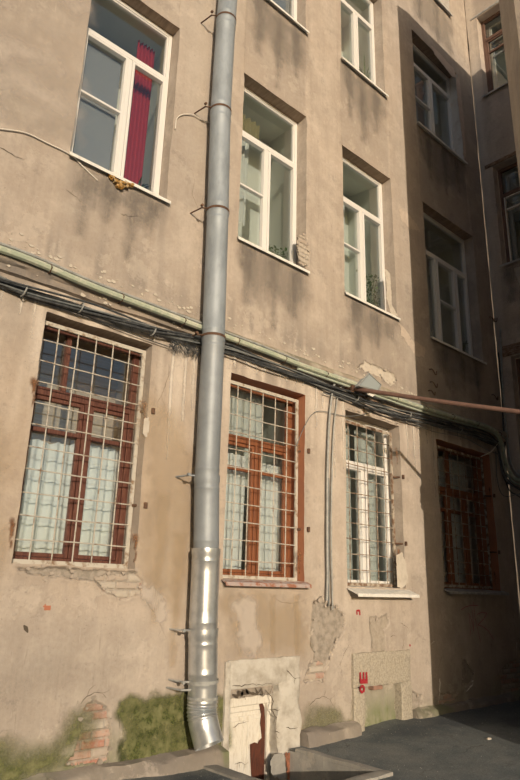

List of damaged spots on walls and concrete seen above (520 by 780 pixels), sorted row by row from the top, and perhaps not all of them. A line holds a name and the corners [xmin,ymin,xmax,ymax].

flaking render [283,342,417,396]
flaking render [16,565,147,600]
flaking render [304,597,346,685]
flaking render [65,695,113,766]
crack [233,683,298,735]